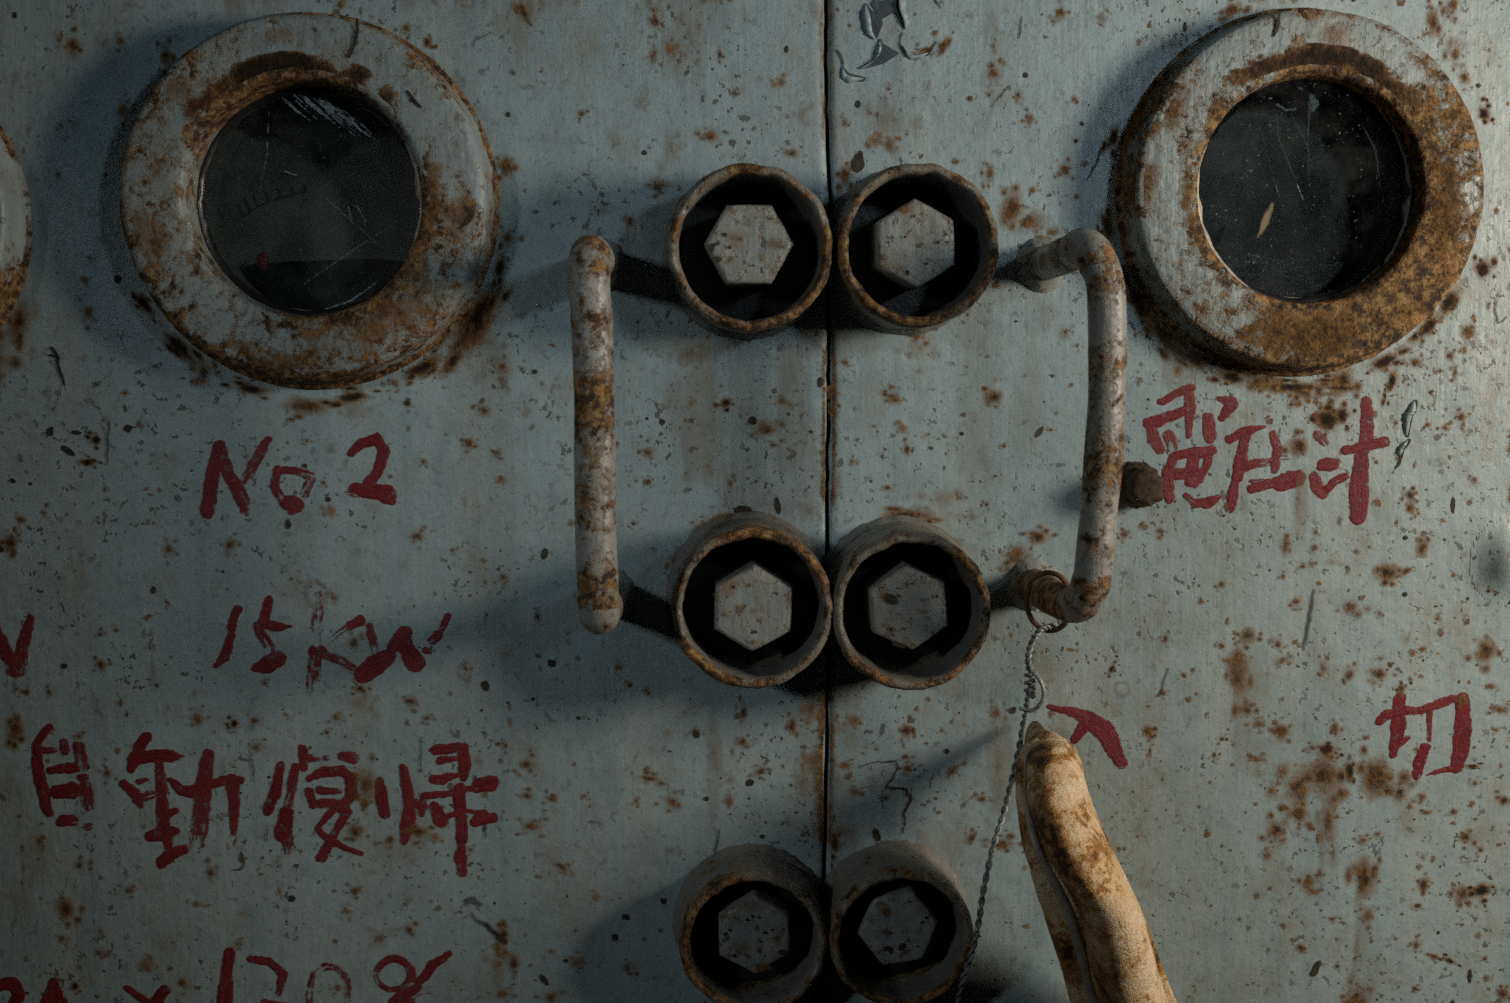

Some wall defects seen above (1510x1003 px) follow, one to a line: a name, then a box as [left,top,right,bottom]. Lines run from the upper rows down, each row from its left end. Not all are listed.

rust [395,25,438,49]
rust [649,9,724,70]
peeling [837,0,937,83]
rust [183,50,399,120]
rust [1121,0,1510,455]
rust [1424,409,1471,468]
rust [1144,617,1510,1003]